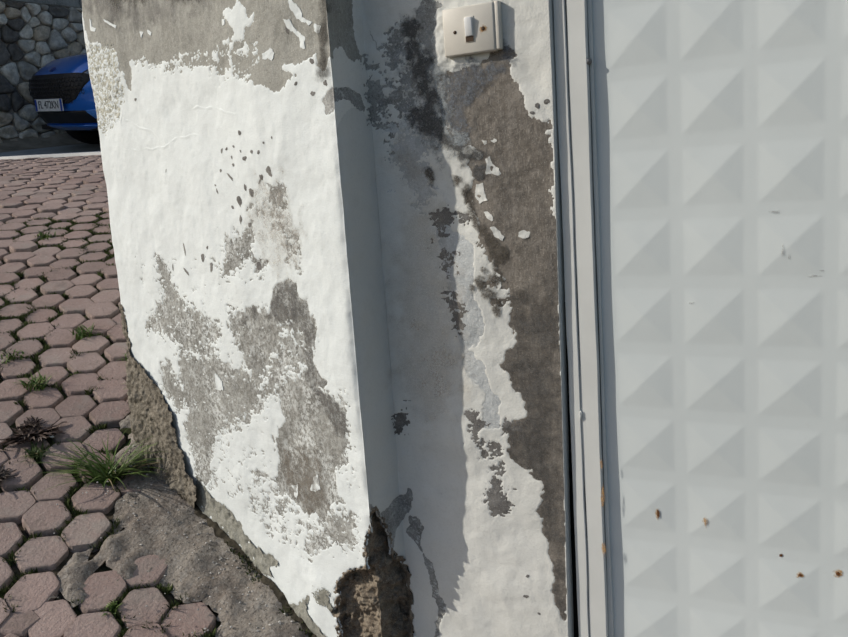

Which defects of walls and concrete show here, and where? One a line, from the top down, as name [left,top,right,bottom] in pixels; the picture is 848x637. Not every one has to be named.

damp [317,0,328,77]
peeling [82,0,567,637]